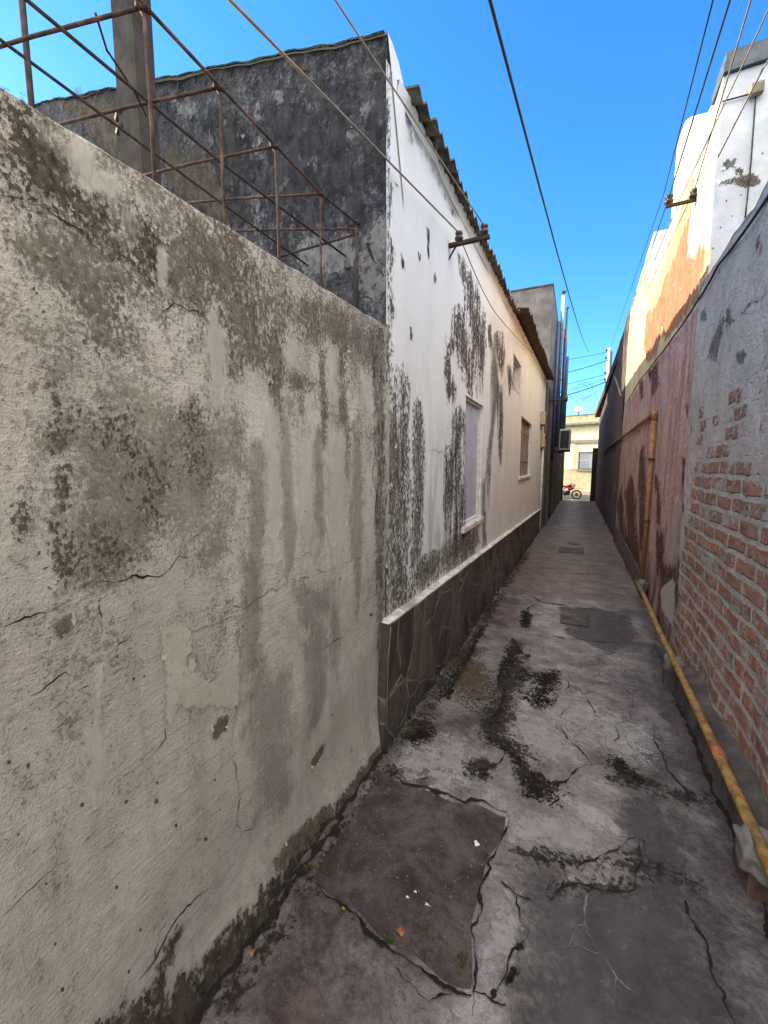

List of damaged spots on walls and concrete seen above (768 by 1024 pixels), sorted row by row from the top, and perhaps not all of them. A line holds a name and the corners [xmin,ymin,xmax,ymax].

spalling [718,158,761,195]
leakage [0,53,397,607]
peeling [639,180,714,402]
leakage [464,332,499,557]
crack [3,524,211,645]
leakage [93,550,750,1024]
crack [189,532,736,1024]
crack [140,892,203,979]
crack [760,902,768,939]